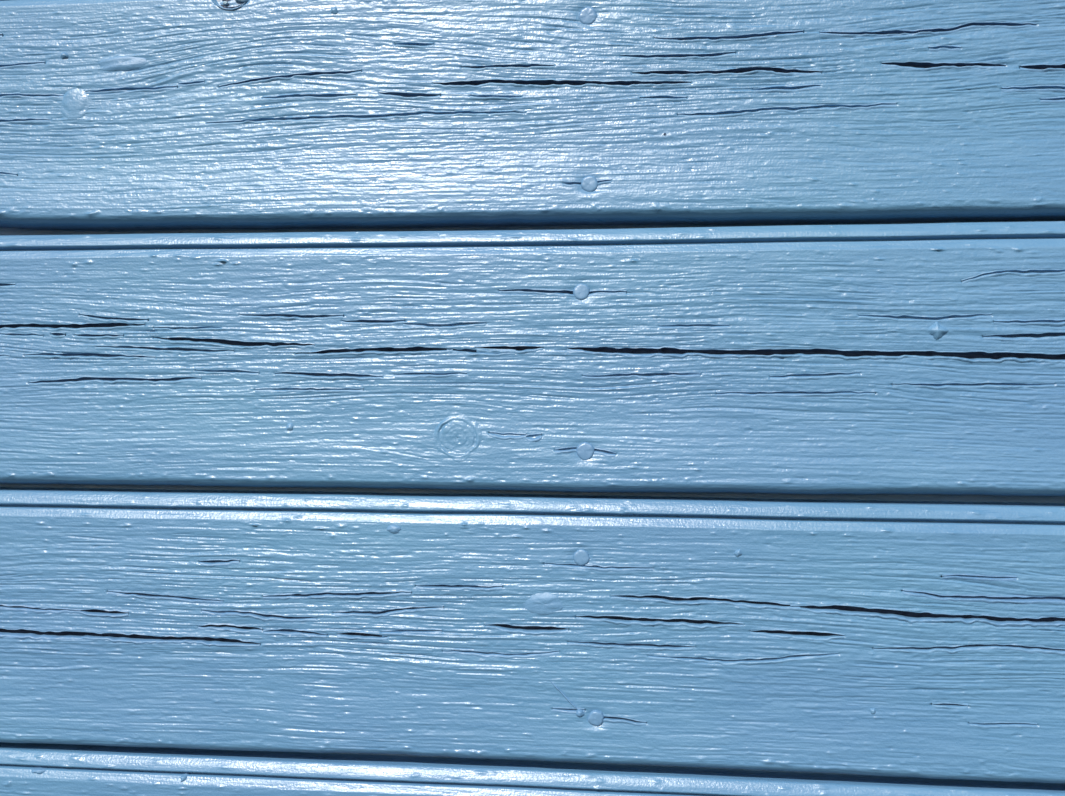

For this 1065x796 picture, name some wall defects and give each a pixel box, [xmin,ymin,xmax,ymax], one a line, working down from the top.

crack [0,21,1065,126]
crack [499,288,626,297]
crack [962,269,1065,284]
crack [0,313,1065,398]
crack [199,559,239,568]
crack [0,562,1065,666]